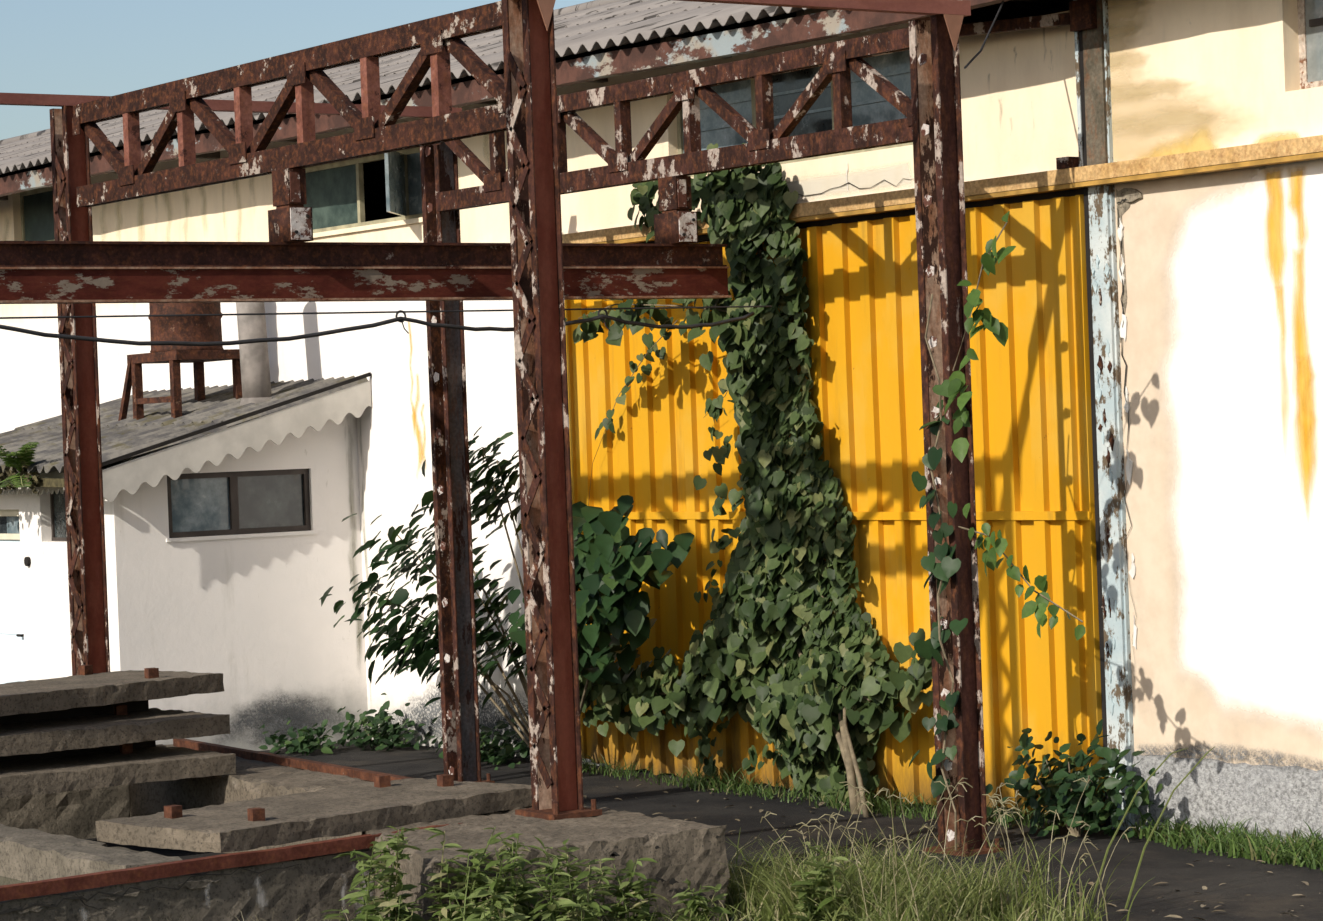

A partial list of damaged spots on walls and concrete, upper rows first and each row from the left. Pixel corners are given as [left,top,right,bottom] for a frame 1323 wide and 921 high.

corrosion [410,368,425,462]
flaking render [1092,167,1323,771]
corrosion [1267,171,1314,500]